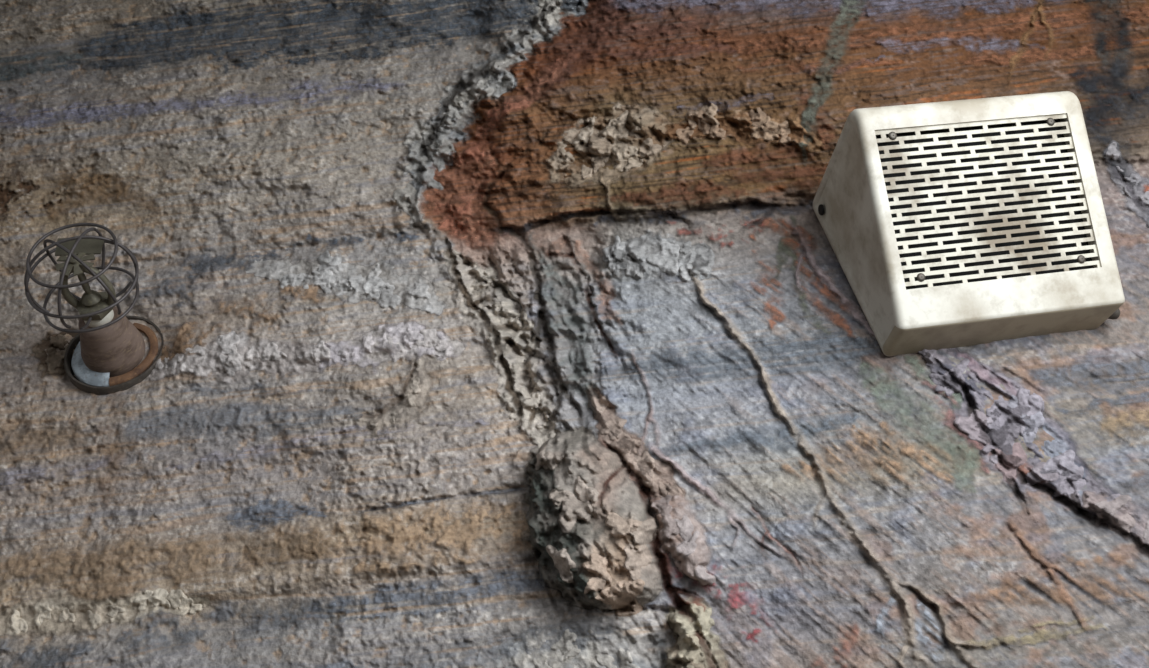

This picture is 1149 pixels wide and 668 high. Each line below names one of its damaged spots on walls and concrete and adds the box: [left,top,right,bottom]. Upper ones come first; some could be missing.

spalling [393,0,588,229]
spalling [547,103,824,187]
leakage [606,0,843,15]
leakage [867,37,1022,63]
leakage [858,0,1032,16]
leakage [1072,0,1149,178]
crack [730,203,800,225]
crack [446,201,571,426]
crack [694,279,807,453]
crack [583,435,650,501]
crack [1007,469,1149,556]
crack [651,535,713,668]